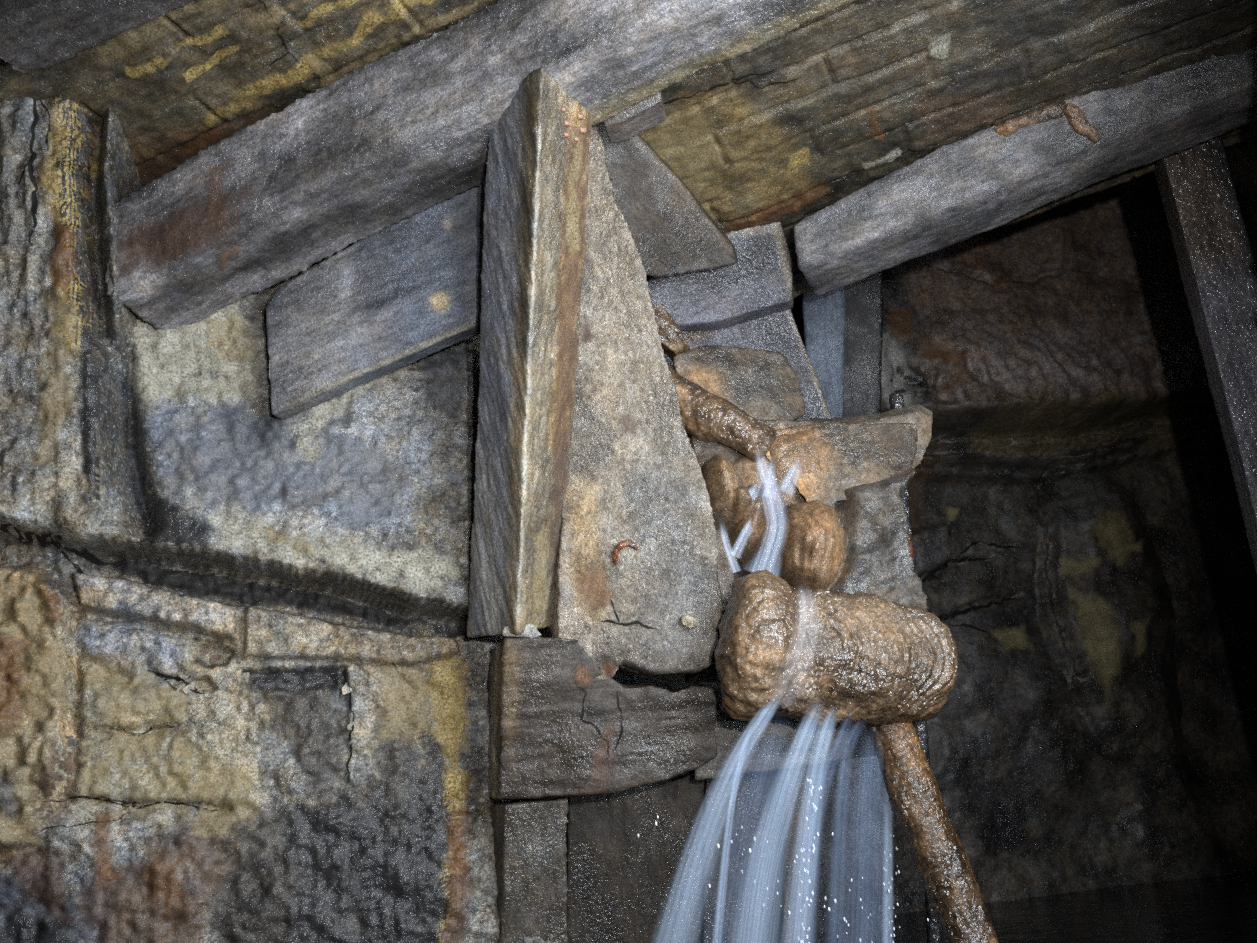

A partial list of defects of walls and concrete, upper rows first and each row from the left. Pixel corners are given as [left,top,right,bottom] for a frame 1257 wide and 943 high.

crack [19,99,51,245]
crack [24,795,232,831]
leakage [212,713,468,943]
corrosion [381,658,468,943]